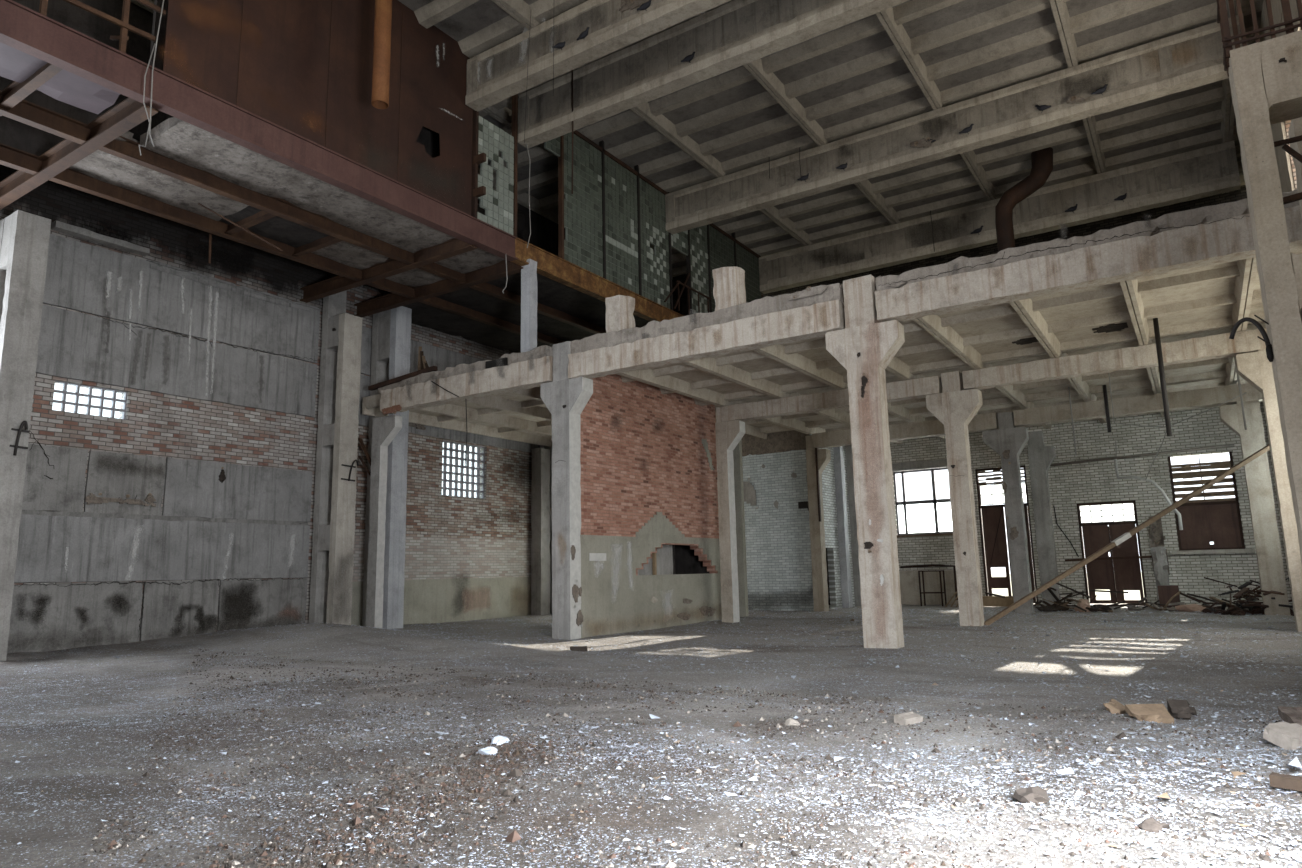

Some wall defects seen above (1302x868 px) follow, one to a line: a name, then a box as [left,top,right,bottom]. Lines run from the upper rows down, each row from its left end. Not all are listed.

damp [19,596,49,622]
damp [107,594,128,613]
damp [172,584,297,635]